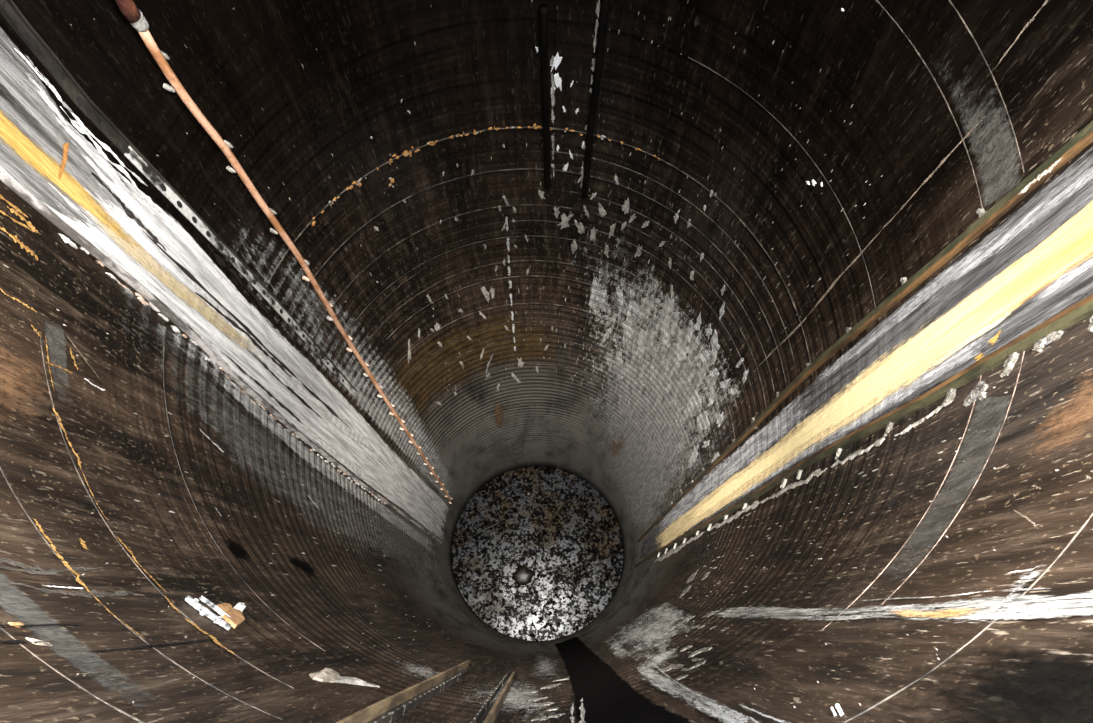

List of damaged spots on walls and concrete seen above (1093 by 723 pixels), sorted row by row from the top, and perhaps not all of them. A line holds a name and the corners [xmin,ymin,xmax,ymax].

rust [377,124,583,188]
rust [0,194,40,261]
damp [571,148,1093,562]